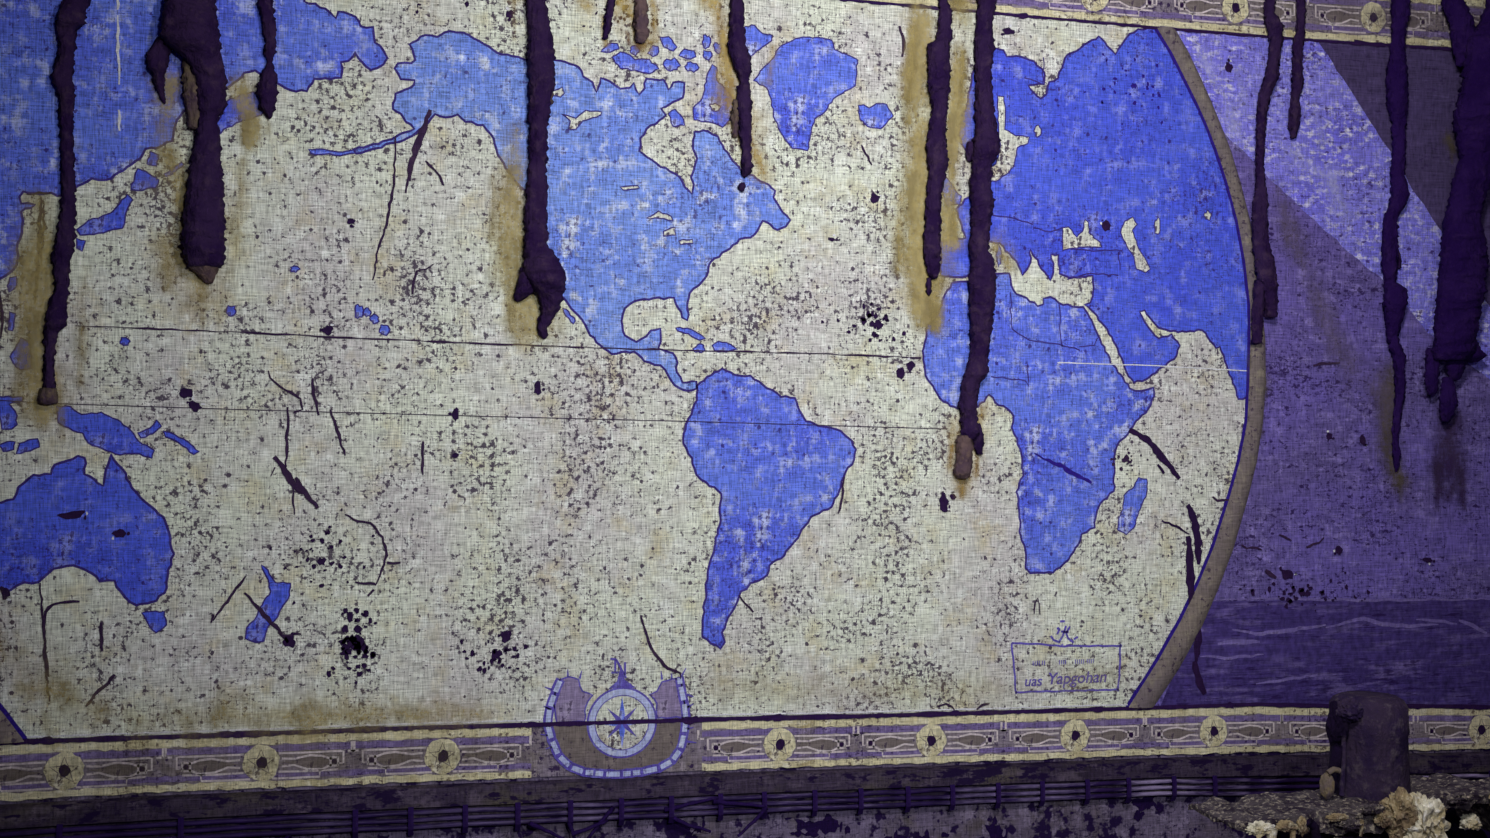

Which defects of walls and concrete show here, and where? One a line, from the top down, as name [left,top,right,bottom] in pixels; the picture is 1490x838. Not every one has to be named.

corrosion [617,0,655,47]
corrosion [702,0,740,129]
corrosion [234,80,261,149]
corrosion [840,0,1451,331]
corrosion [497,151,539,338]
peeling [656,819,705,838]
peeling [785,813,851,838]
peeling [884,829,950,838]
peeling [985,816,1008,838]
peeling [1124,796,1164,822]